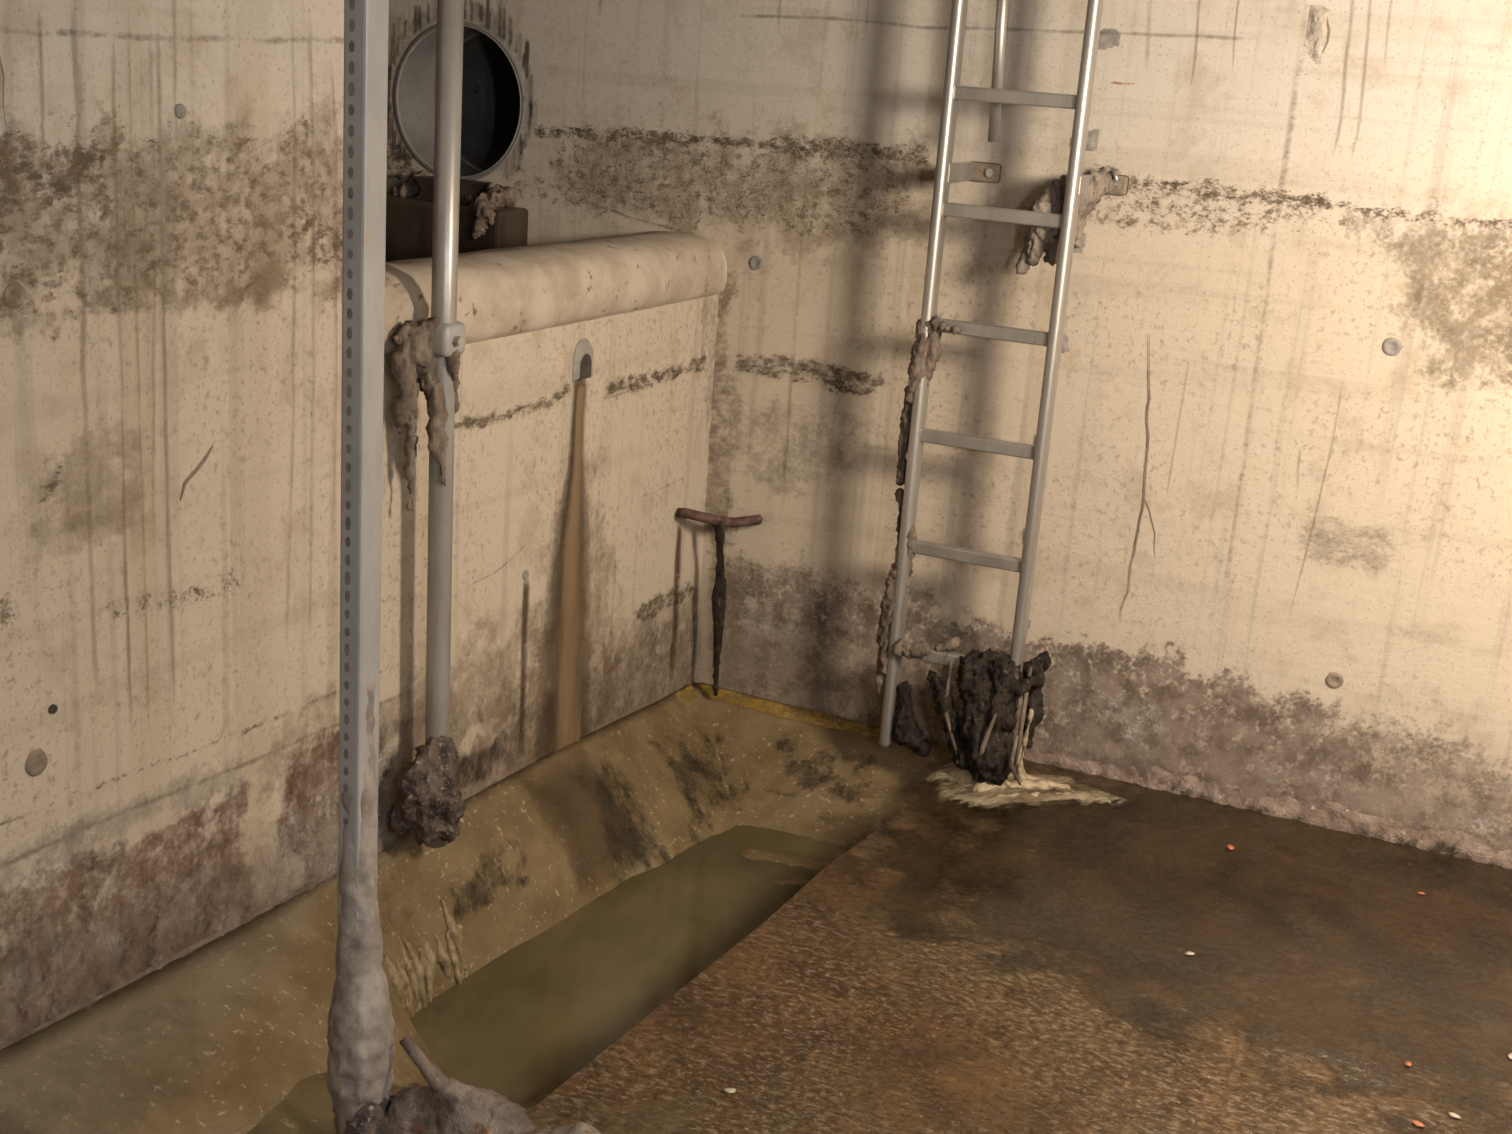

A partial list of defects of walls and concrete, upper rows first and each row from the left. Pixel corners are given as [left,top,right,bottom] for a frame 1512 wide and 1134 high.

leakage [0,114,343,317]
leakage [507,96,928,236]
leakage [1088,167,1512,387]
leakage [455,273,884,789]
leakage [280,645,467,1134]
leakage [823,590,1512,1134]